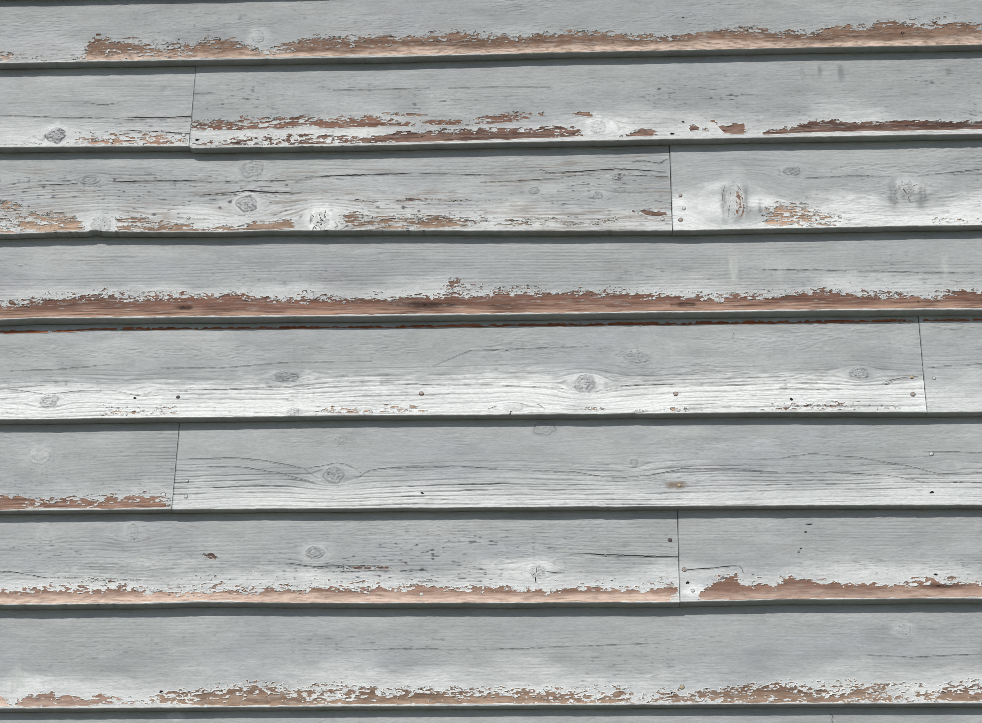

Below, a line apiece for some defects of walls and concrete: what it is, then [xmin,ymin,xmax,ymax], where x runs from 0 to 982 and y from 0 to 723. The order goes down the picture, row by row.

peeling [69,16,982,61]
peeling [66,111,594,147]
peeling [688,119,749,135]
peeling [761,118,982,136]
peeling [0,199,85,234]
peeling [114,214,295,232]
peeling [338,198,619,230]
peeling [0,277,982,334]
peeling [0,491,171,510]
peeling [0,565,679,604]
peeling [697,571,982,601]
peeling [0,678,982,708]